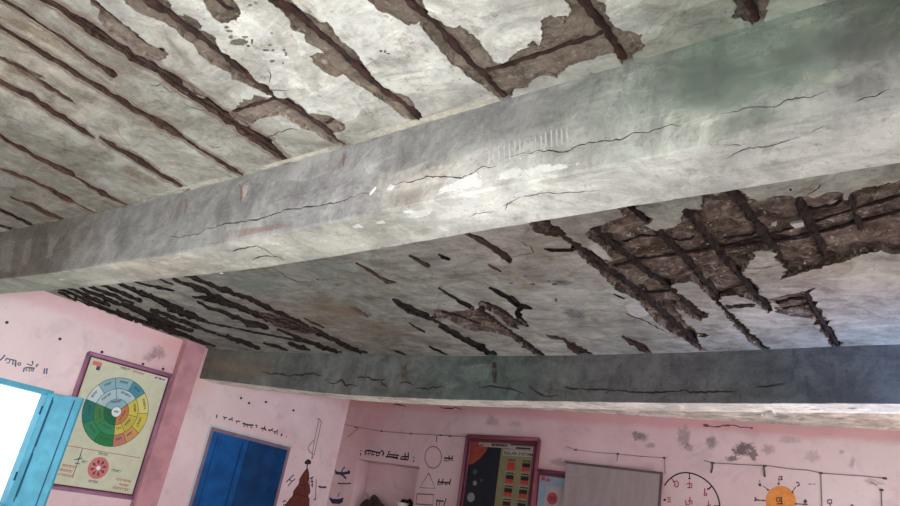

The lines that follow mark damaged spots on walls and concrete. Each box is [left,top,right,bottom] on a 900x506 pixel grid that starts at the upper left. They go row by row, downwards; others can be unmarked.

spalling [0,0,346,192]
spalling [203,0,424,120]
spalling [368,0,646,101]
crack [395,123,684,185]
crack [171,193,370,238]
crack [472,190,600,216]
spalling [530,180,900,353]
spalling [57,275,368,354]
spalling [392,283,544,356]
crack [260,371,462,410]
crack [478,383,784,397]
leakage [726,442,758,461]